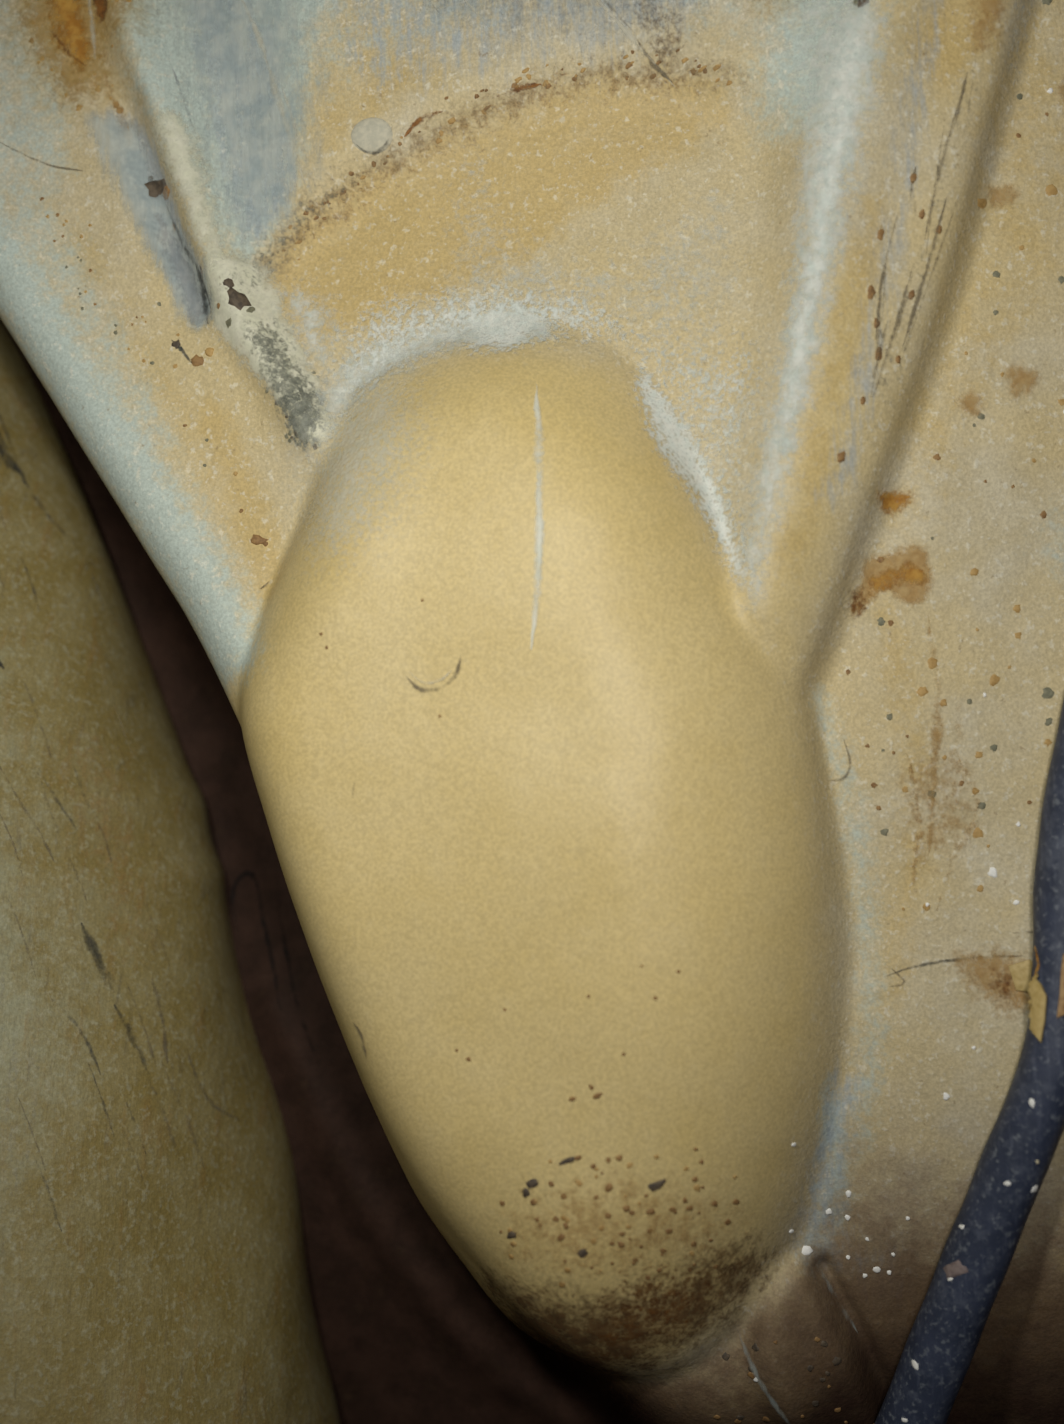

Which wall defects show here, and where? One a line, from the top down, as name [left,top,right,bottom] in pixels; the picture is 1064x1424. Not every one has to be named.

corrosion [27,0,132,131]
mould [252,324,329,450]
corrosion [963,395,985,427]
corrosion [878,491,910,513]
corrosion [851,537,934,615]
corrosion [1042,687,1054,699]
corrosion [959,781,986,809]
corrosion [486,1147,766,1377]